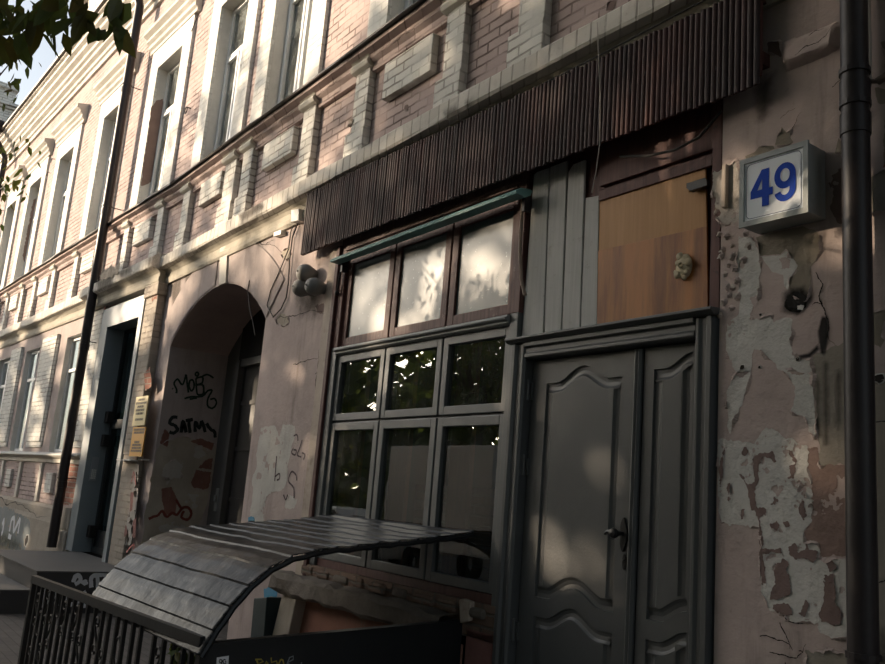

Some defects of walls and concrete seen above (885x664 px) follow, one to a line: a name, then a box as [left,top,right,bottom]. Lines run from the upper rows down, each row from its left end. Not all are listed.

peeling [710,128,793,226]
peeling [829,168,842,224]
flaking render [871,120,885,216]
crack [812,273,832,342]
peeling [250,424,297,522]
peeling [716,226,847,664]
flaking render [875,373,885,664]
crack [760,613,806,664]